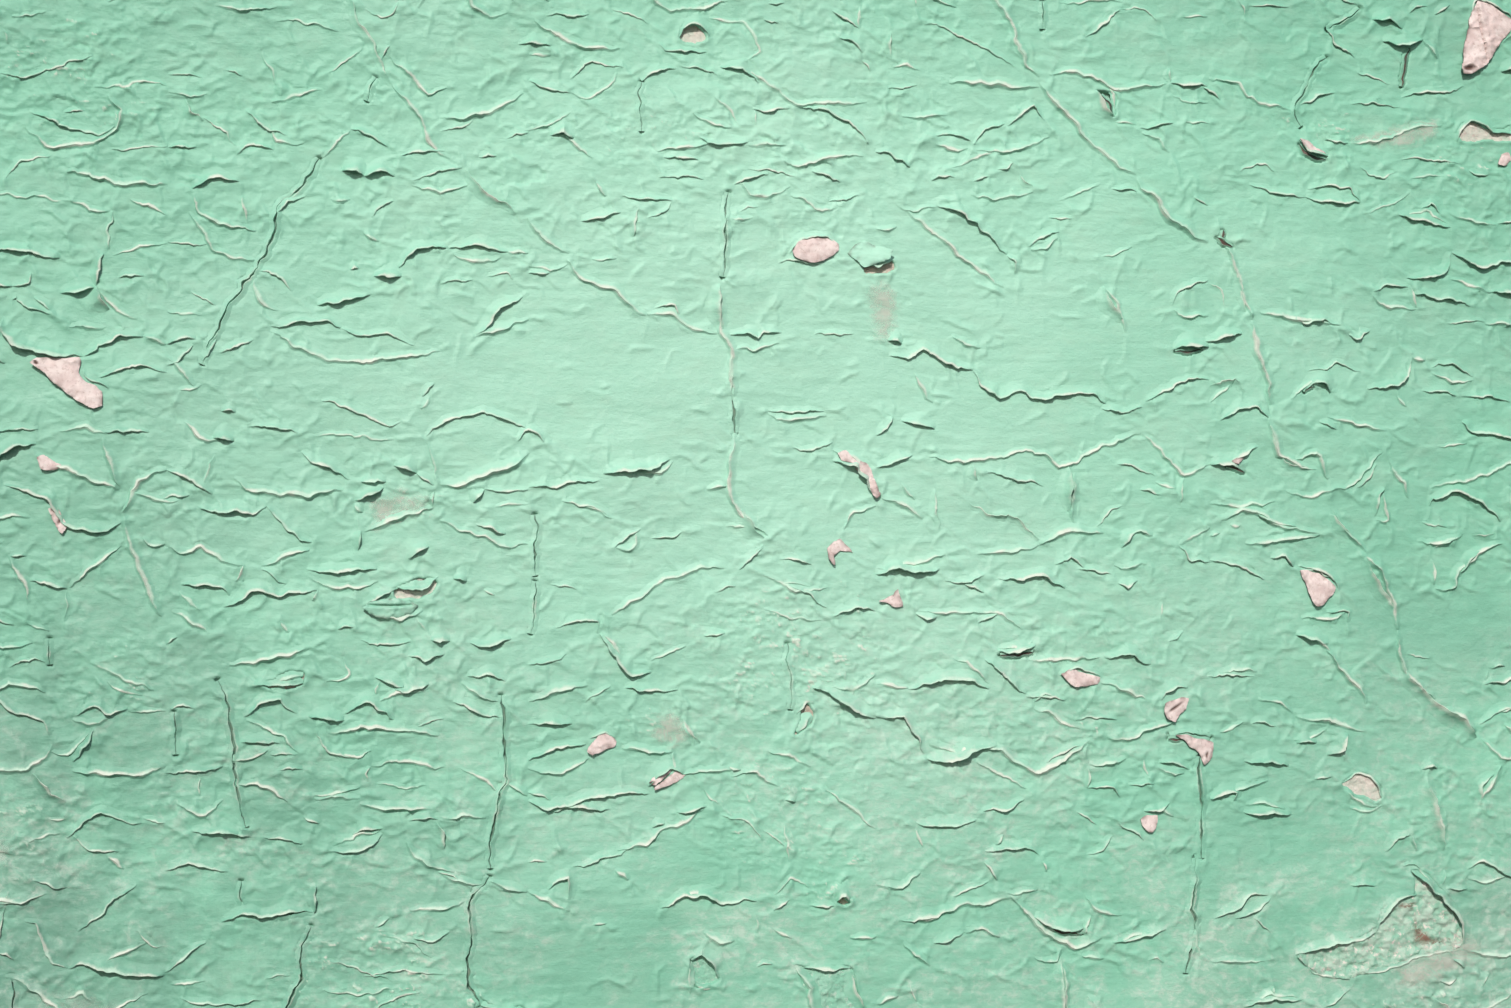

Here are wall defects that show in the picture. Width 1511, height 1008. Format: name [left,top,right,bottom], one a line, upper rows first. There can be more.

peeling [1462,0,1511,74]
crack [198,157,323,365]
peeling [778,230,895,274]
peeling [0,317,216,408]
crack [527,192,769,541]
crack [990,0,1511,851]
crack [165,679,290,829]
crack [438,664,528,1007]
peeling [526,695,815,847]
peeling [1058,660,1214,765]
crack [220,881,317,1008]
peeling [1295,860,1511,979]